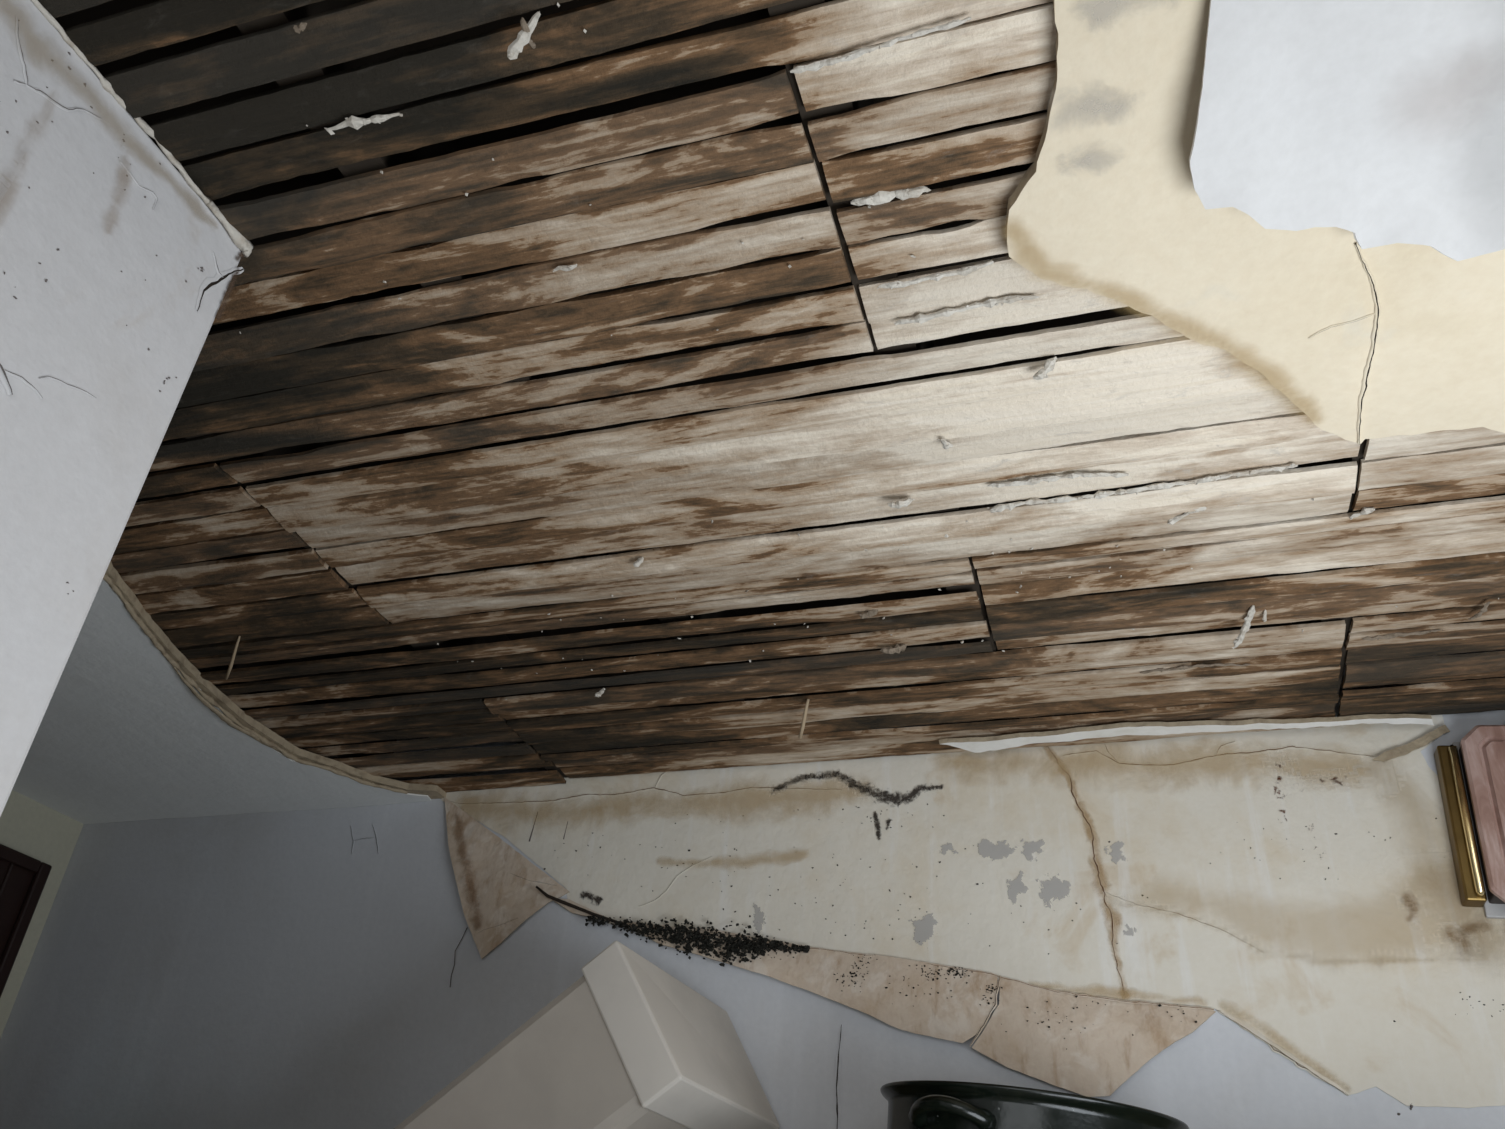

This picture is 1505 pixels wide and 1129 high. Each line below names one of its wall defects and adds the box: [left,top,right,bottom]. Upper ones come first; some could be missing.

crack [14,16,102,120]
flaking render [1006,0,1505,444]
crack [195,251,244,311]
crack [0,363,96,399]
crack [1308,243,1381,445]
damp [773,771,943,840]
damp [581,892,603,905]
peeling [441,715,1505,1108]
crack [1047,741,1373,996]
damp [885,965,973,999]